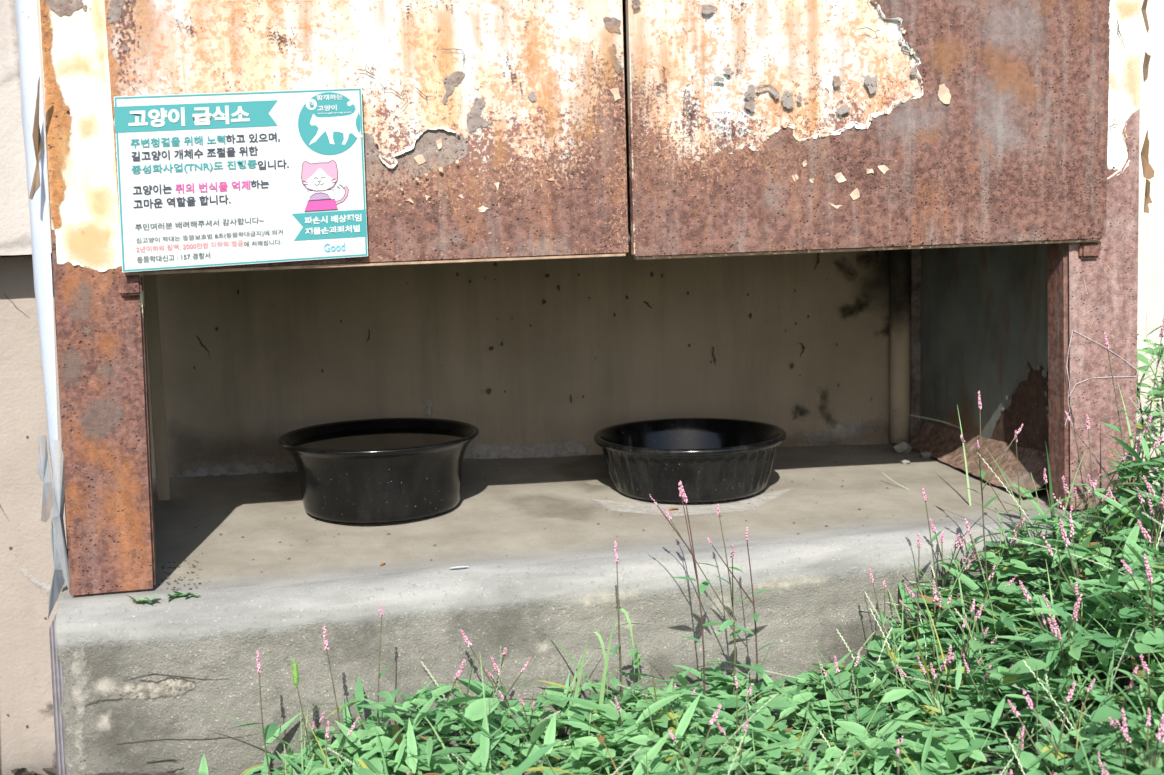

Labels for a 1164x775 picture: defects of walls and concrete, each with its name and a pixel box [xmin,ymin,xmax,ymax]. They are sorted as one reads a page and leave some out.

spalling [116,679,196,700]